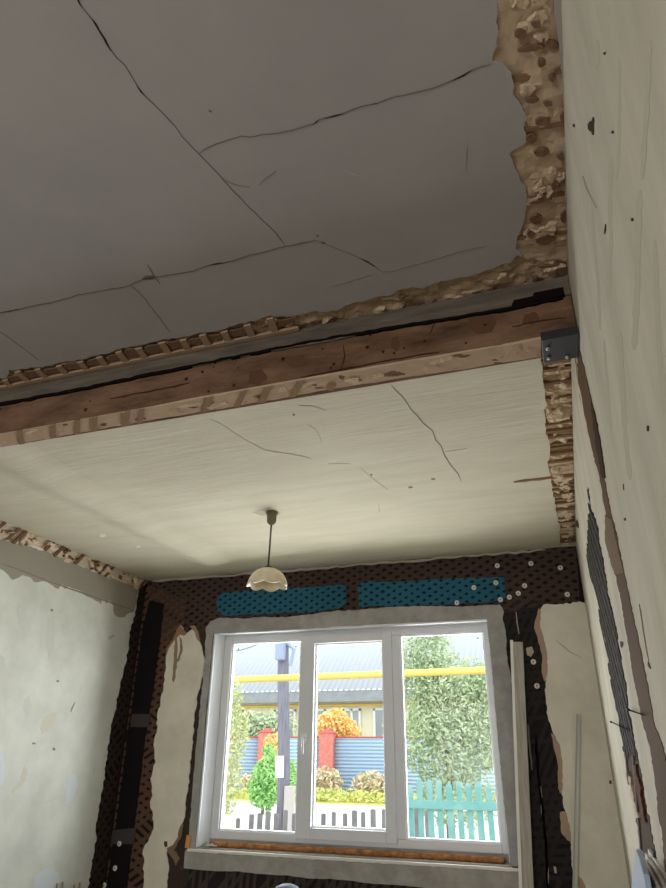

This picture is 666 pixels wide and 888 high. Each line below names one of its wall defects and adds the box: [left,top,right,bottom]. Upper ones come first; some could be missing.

crack [0,0,491,360]
flaking render [0,0,575,390]
crack [300,323,439,378]
crack [210,405,326,459]
crack [393,388,467,480]
flaking render [541,358,579,546]
peeling [0,521,147,617]
peeling [216,584,347,616]
peeling [357,577,506,608]
spalling [534,609,548,681]
flaking render [164,671,204,888]
spalling [551,733,563,793]